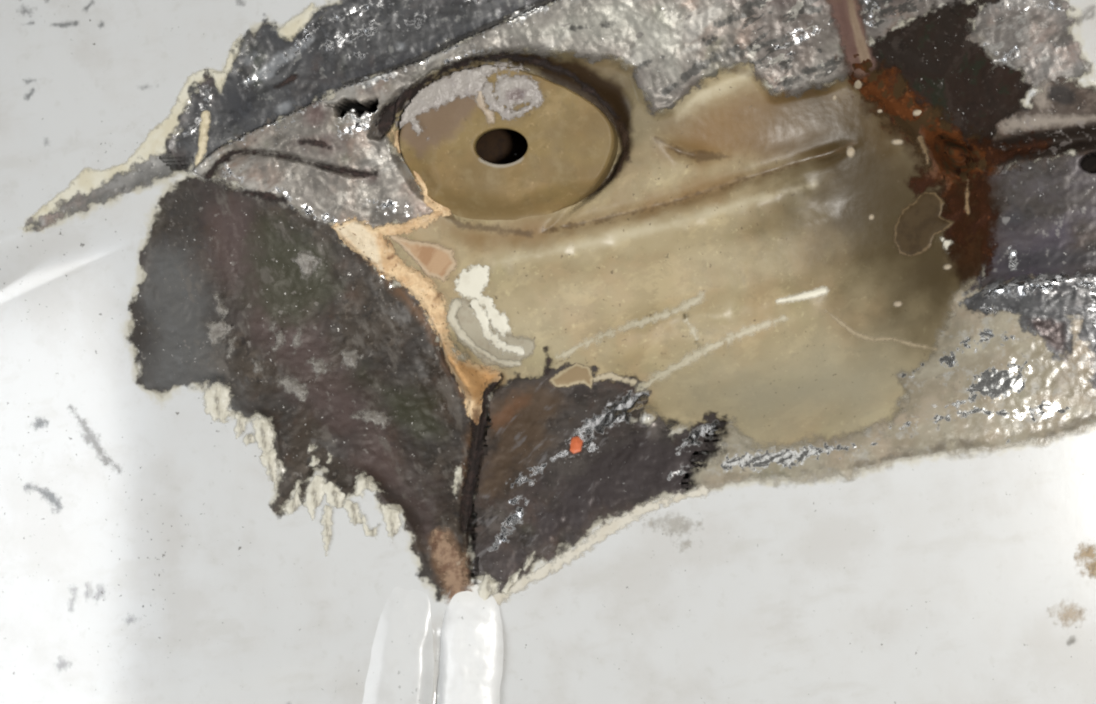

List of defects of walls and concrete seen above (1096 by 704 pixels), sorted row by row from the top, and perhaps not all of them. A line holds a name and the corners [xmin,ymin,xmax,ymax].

peeling [25,0,546,231]
corrosion [826,0,1050,275]
peeling [966,0,1091,89]
peeling [128,151,1096,605]